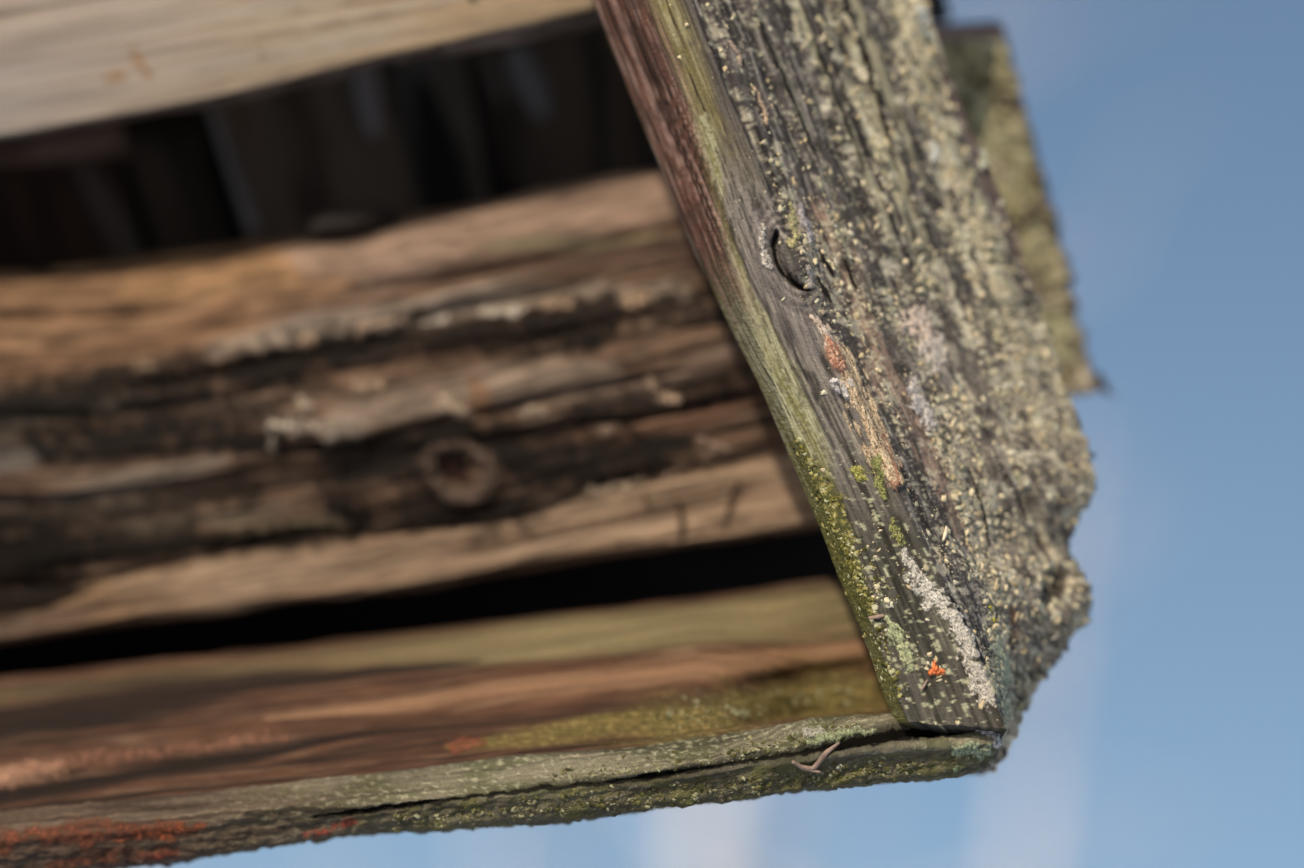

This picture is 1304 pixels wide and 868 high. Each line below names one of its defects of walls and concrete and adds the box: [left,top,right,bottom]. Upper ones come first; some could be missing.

crack [243,728,989,817]
corrosion [0,818,205,868]